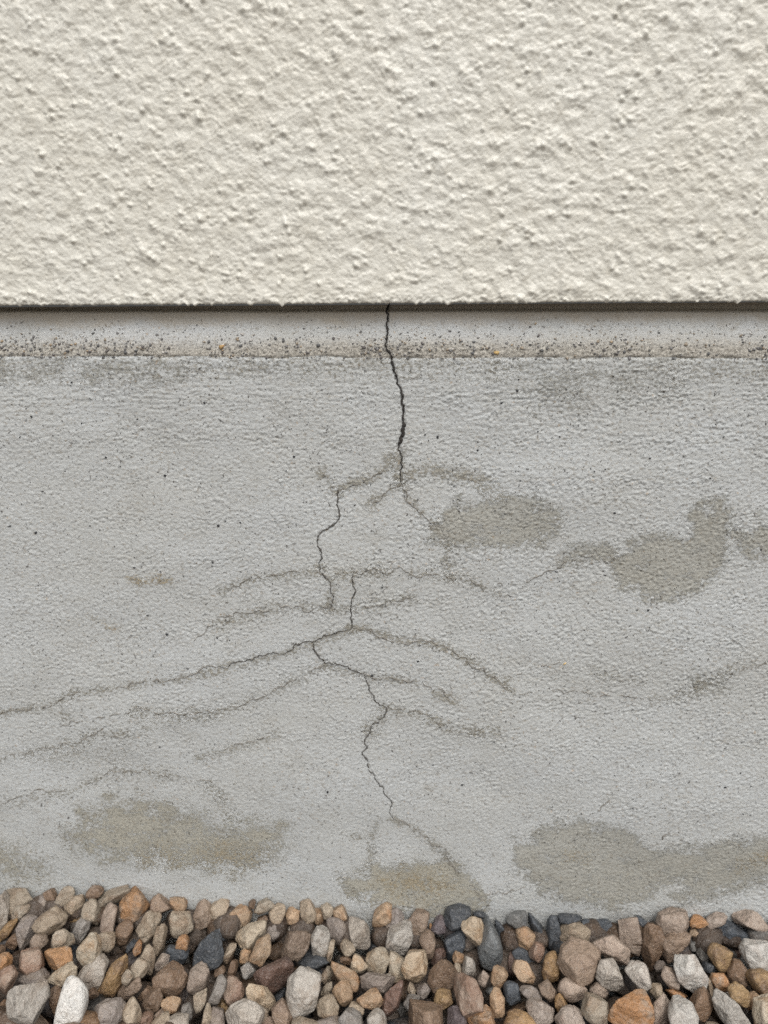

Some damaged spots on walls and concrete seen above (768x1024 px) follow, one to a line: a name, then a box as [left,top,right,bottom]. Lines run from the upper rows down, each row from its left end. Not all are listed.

damp [0,562,516,884]
crack [0,303,650,906]
damp [314,446,768,605]
damp [508,819,768,913]